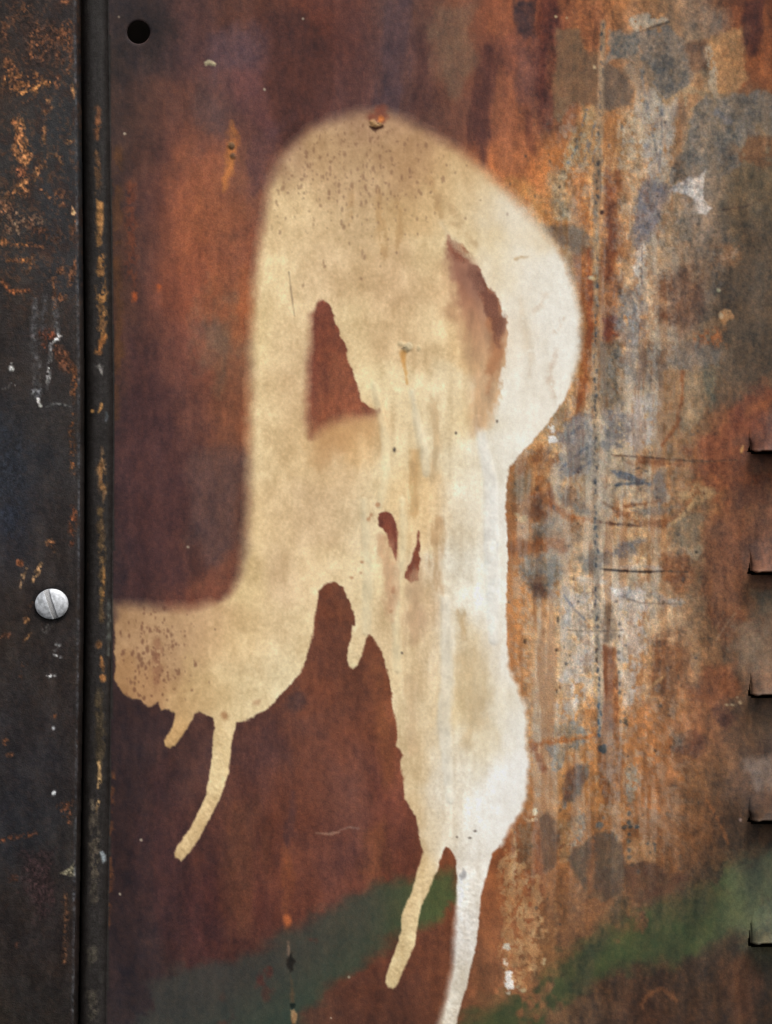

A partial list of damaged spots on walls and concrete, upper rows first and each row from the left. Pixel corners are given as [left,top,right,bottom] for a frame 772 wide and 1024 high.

rust [0,0,76,297]
rust [459,0,607,223]
rust [664,0,772,164]
rust [38,103,128,476]
rust [312,341,365,422]
rust [445,253,509,400]
rust [544,163,628,421]
rust [507,434,772,760]
rust [359,653,407,806]
rust [448,604,497,758]
rust [529,645,626,810]
rust [462,940,523,1016]